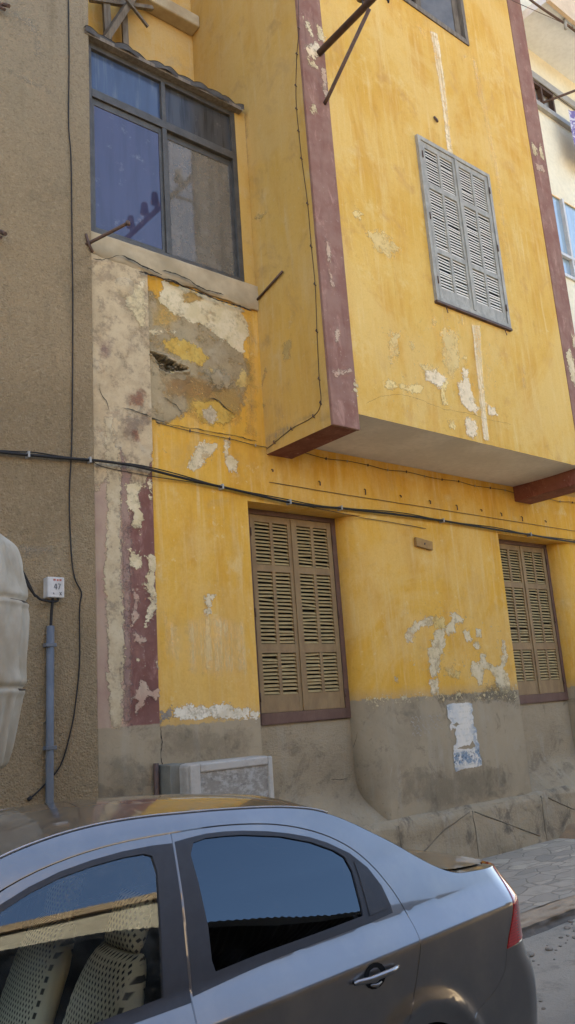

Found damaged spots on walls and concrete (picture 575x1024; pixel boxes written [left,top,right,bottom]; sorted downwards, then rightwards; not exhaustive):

peeling [303,16,328,96]
peeling [353,210,402,258]
crack [99,384,255,441]
peeling [378,319,501,438]
peeling [91,253,266,729]
peeling [366,601,518,707]